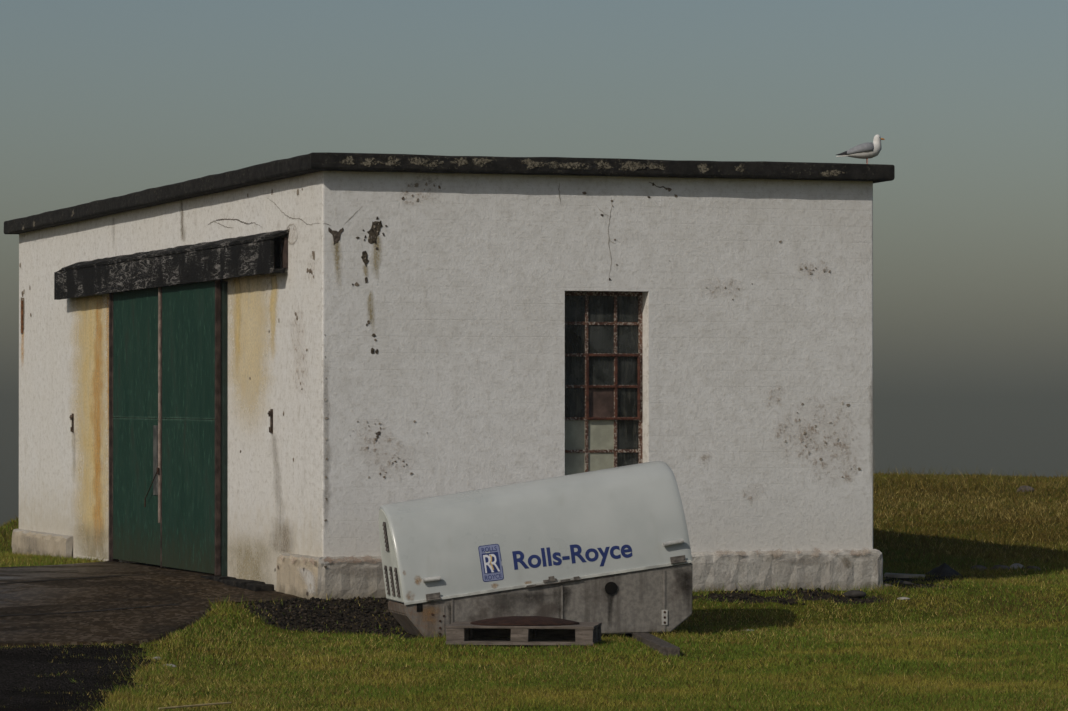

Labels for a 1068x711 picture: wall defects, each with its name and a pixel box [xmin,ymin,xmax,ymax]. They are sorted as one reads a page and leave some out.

crack [208,199,360,228]
rust [94,300,109,534]